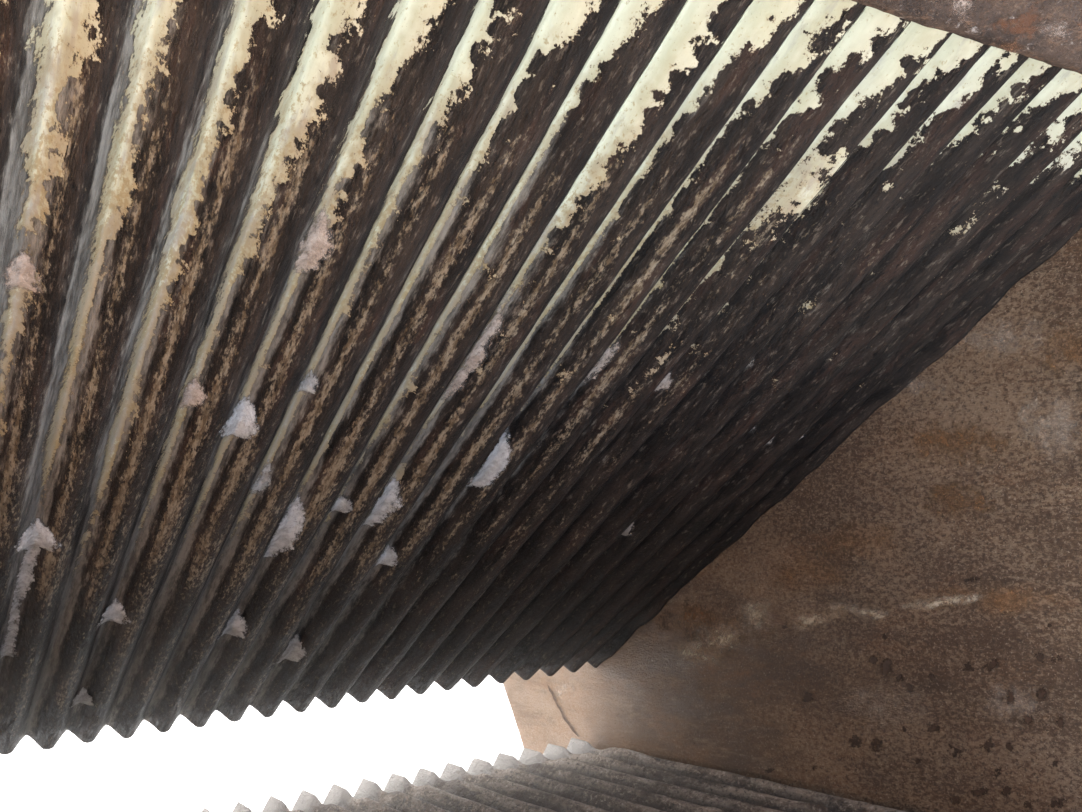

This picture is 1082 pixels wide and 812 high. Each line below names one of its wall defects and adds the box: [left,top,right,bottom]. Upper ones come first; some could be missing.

peeling [0,0,107,449]
peeling [33,0,183,525]
peeling [73,0,286,571]
peeling [134,0,368,543]
peeling [230,0,523,539]
peeling [292,0,665,545]
peeling [377,0,1082,500]
water stain [1,545,41,649]
water stain [917,595,976,609]